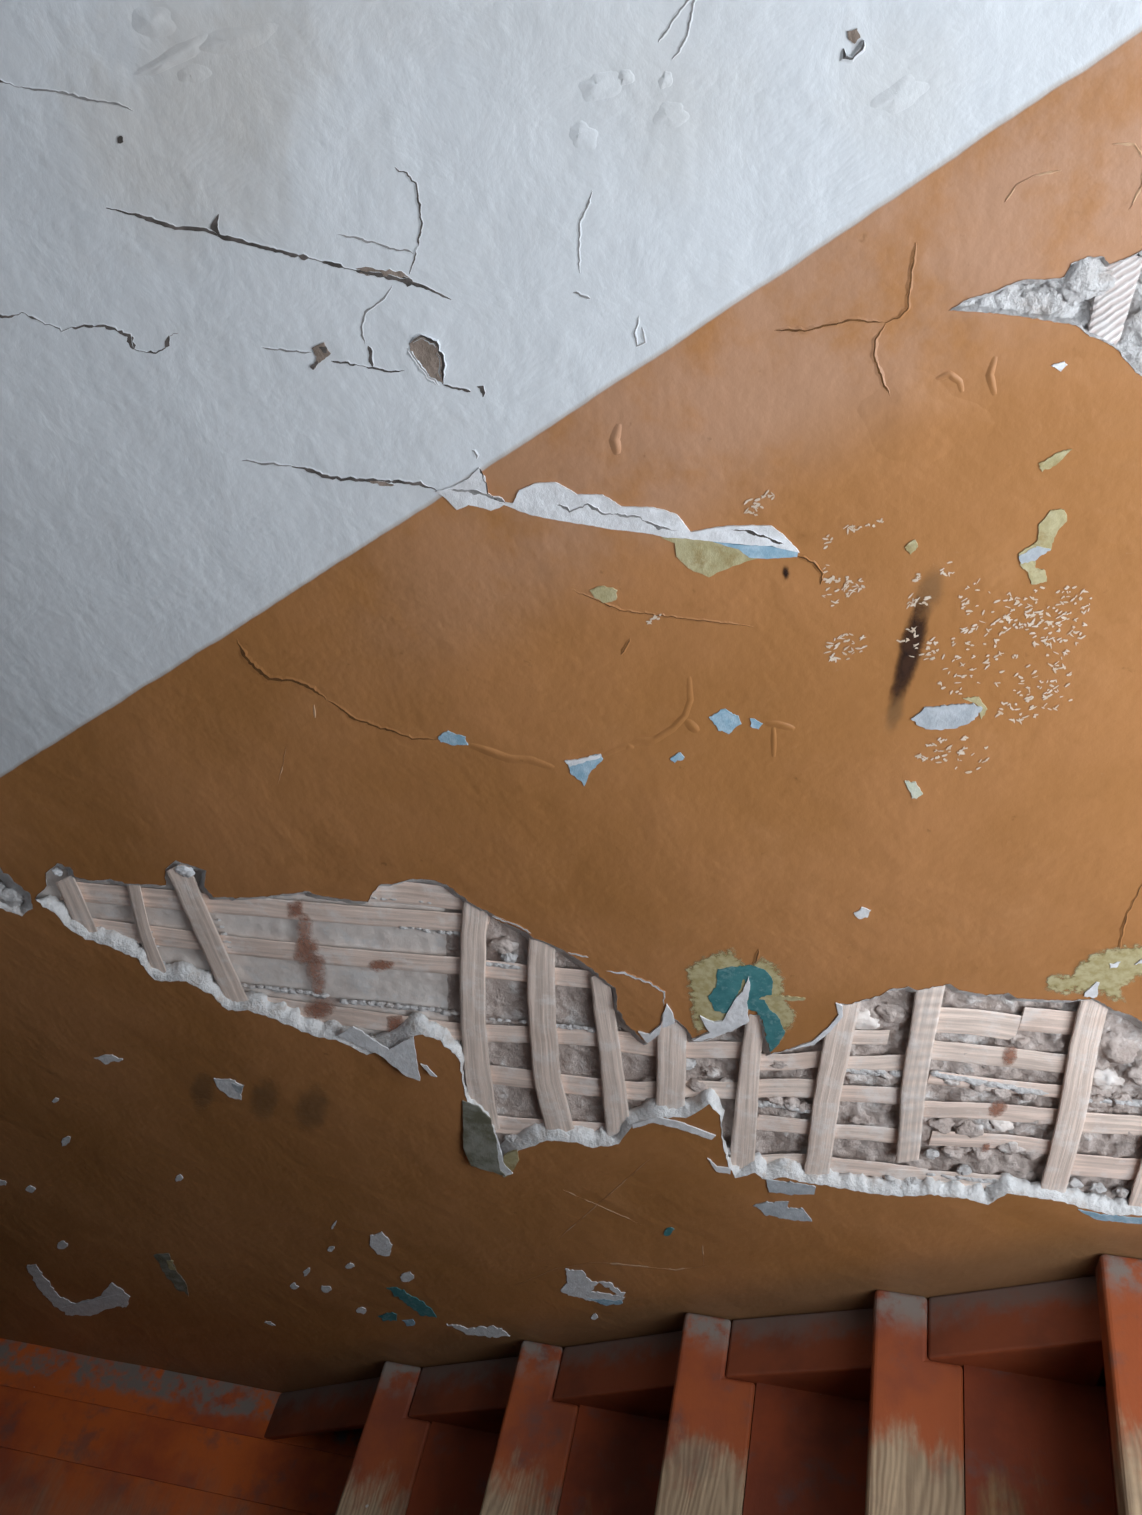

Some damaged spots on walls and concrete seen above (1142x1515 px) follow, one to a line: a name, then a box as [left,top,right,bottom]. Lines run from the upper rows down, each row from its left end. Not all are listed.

crack [0,78,133,111]
crack [0,311,178,354]
crack [106,167,452,373]
crack [774,243,917,396]
spalling [950,251,1142,376]
crack [443,384,486,397]
spalling [435,468,825,585]
spalling [1019,509,1067,585]
leakage [892,606,926,697]
spalling [911,696,987,730]
spalling [0,860,1142,1224]
spalling [561,1268,625,1320]